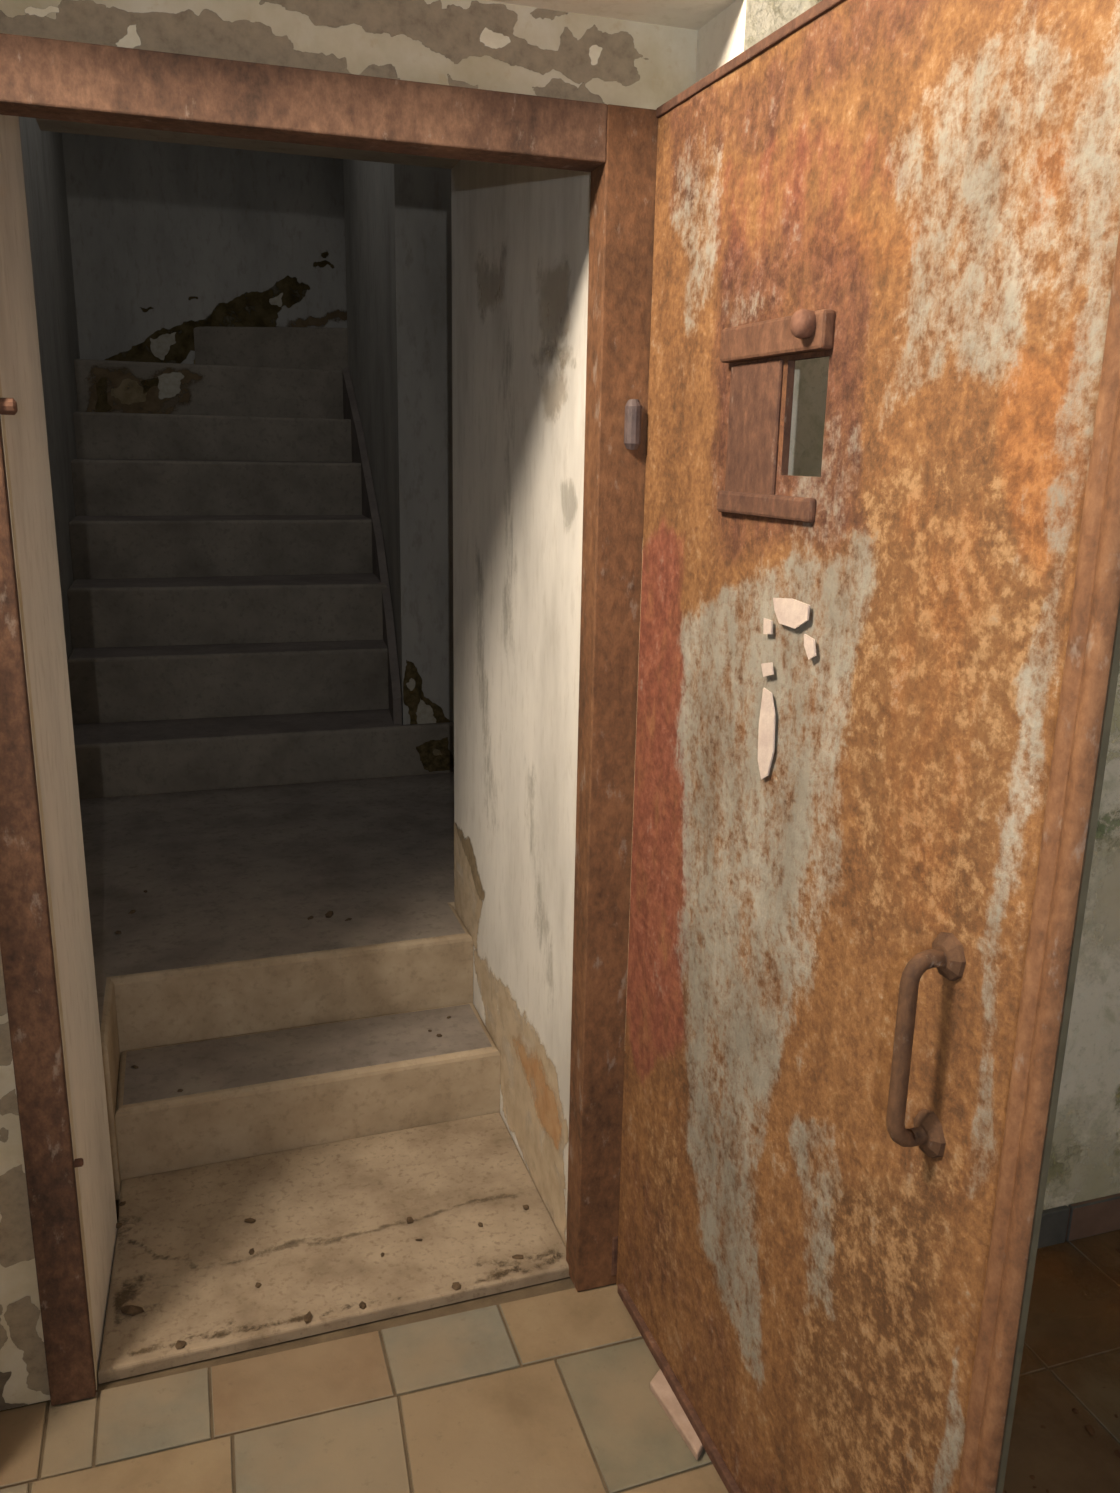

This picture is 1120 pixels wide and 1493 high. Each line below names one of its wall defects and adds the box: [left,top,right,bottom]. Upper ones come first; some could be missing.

peeling [0,0,648,104]
flaking render [86,276,347,414]
flaking render [403,660,454,772]
peeling [0,949,12,1066]
peeling [0,1089,19,1142]
flaking render [0,1164,35,1268]
flaking render [0,1296,50,1410]